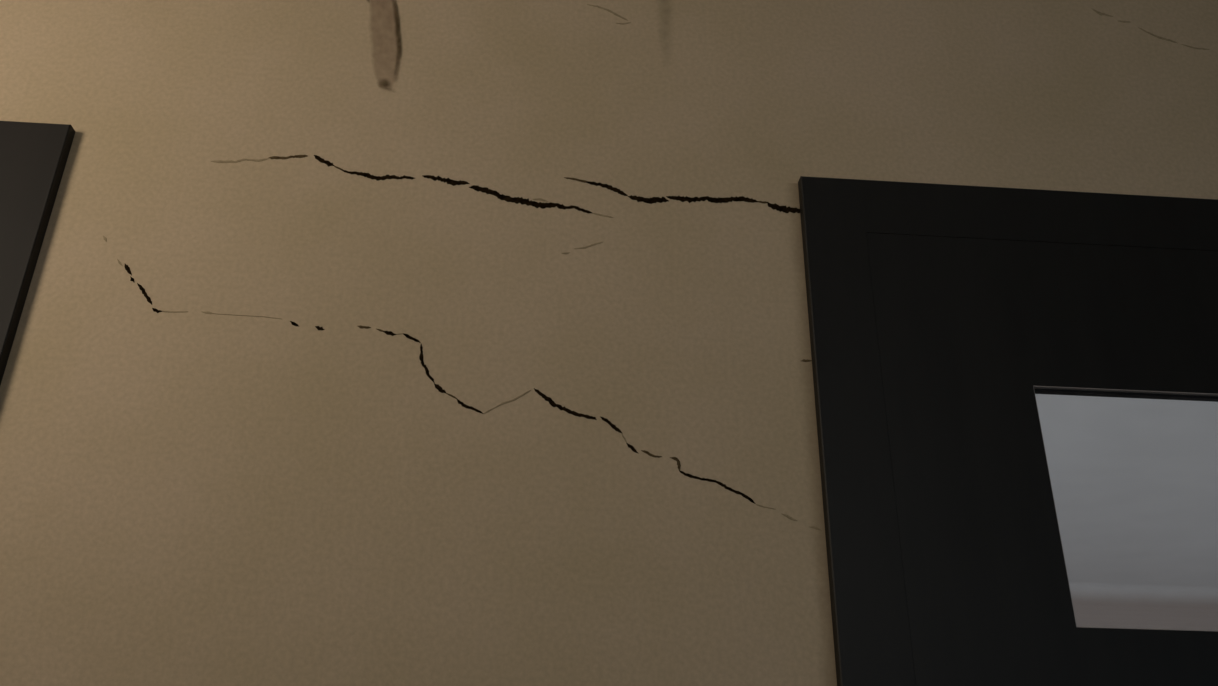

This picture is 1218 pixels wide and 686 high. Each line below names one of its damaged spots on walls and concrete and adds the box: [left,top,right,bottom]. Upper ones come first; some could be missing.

crack [211,155,800,254]
crack [103,236,325,330]
crack [358,325,821,530]